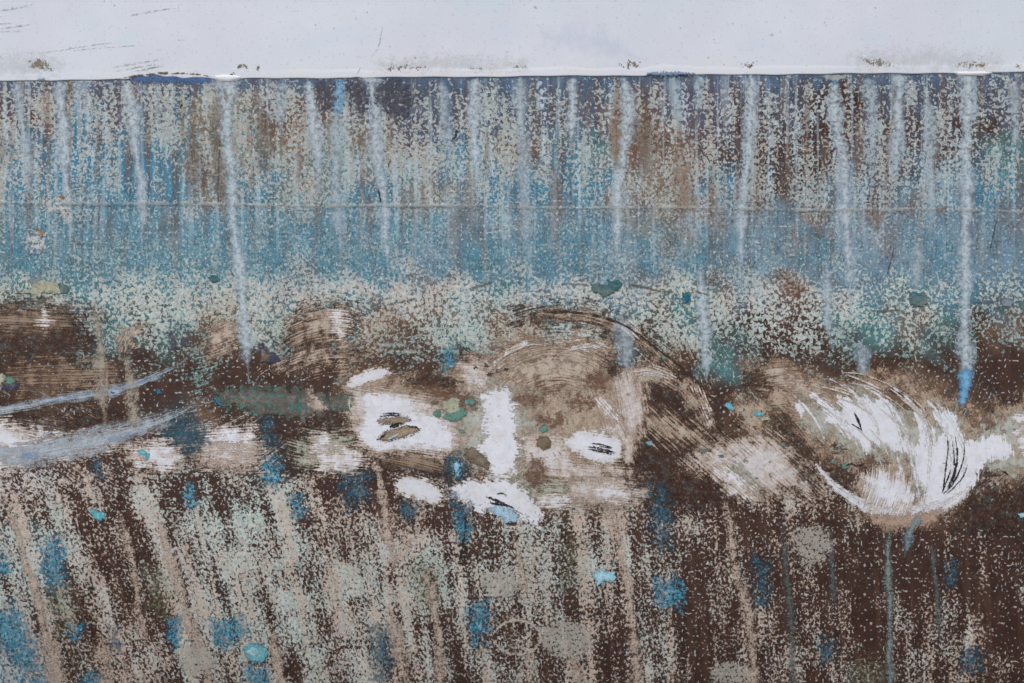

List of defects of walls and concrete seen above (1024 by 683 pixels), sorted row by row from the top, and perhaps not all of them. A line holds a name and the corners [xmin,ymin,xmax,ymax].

leakage [28,58,72,251]
leakage [123,83,147,228]
leakage [215,64,259,362]
leakage [305,79,347,229]
leakage [364,64,426,261]
leakage [612,59,640,263]
leakage [736,61,758,278]
leakage [829,84,852,282]
leakage [861,57,905,177]
leakage [955,61,985,378]
leakage [39,316,163,422]
leakage [696,272,712,373]